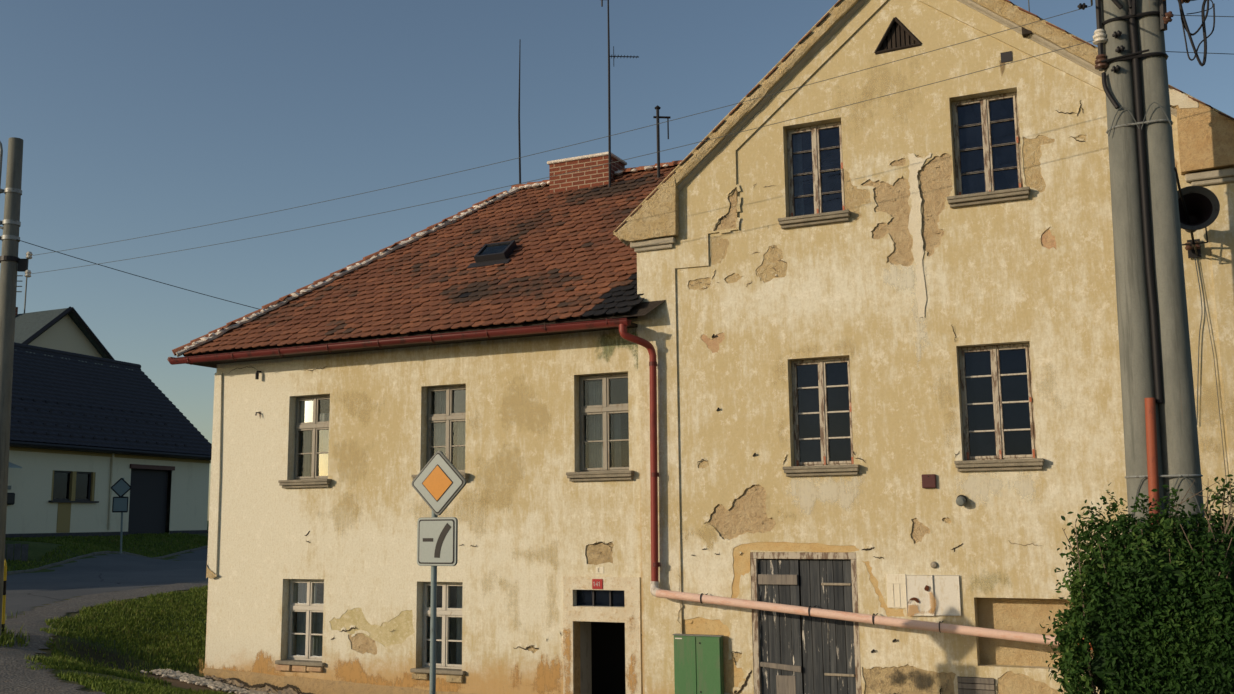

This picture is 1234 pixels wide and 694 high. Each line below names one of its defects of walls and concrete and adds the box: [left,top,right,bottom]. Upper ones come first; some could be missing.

peeling [1021,133,1055,192]
peeling [843,150,954,267]
peeling [685,184,788,291]
peeling [698,330,727,353]
peeling [906,513,955,547]
peeling [582,538,617,567]
peeling [704,480,905,617]
peeling [329,606,415,657]
damp [199,651,281,680]
damp [335,659,459,692]
peeling [862,660,959,694]